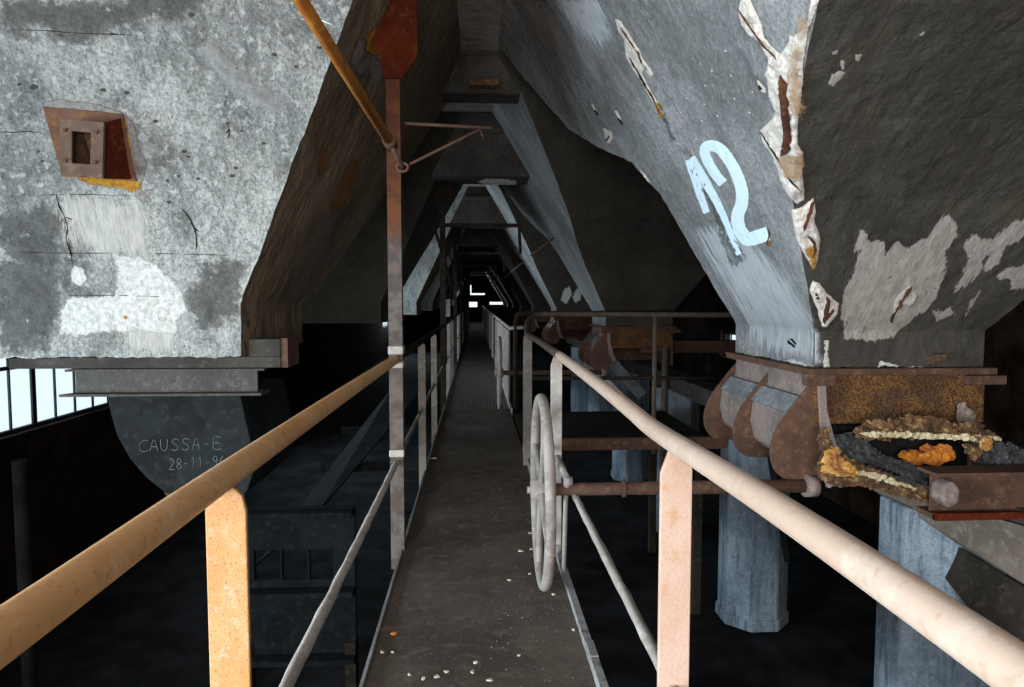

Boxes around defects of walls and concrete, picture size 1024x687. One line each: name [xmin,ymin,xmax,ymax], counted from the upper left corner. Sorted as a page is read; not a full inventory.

corrosion [64,117,141,192]
leakage [0,191,247,355]
crack [28,194,227,267]
peeling [738,0,1024,342]